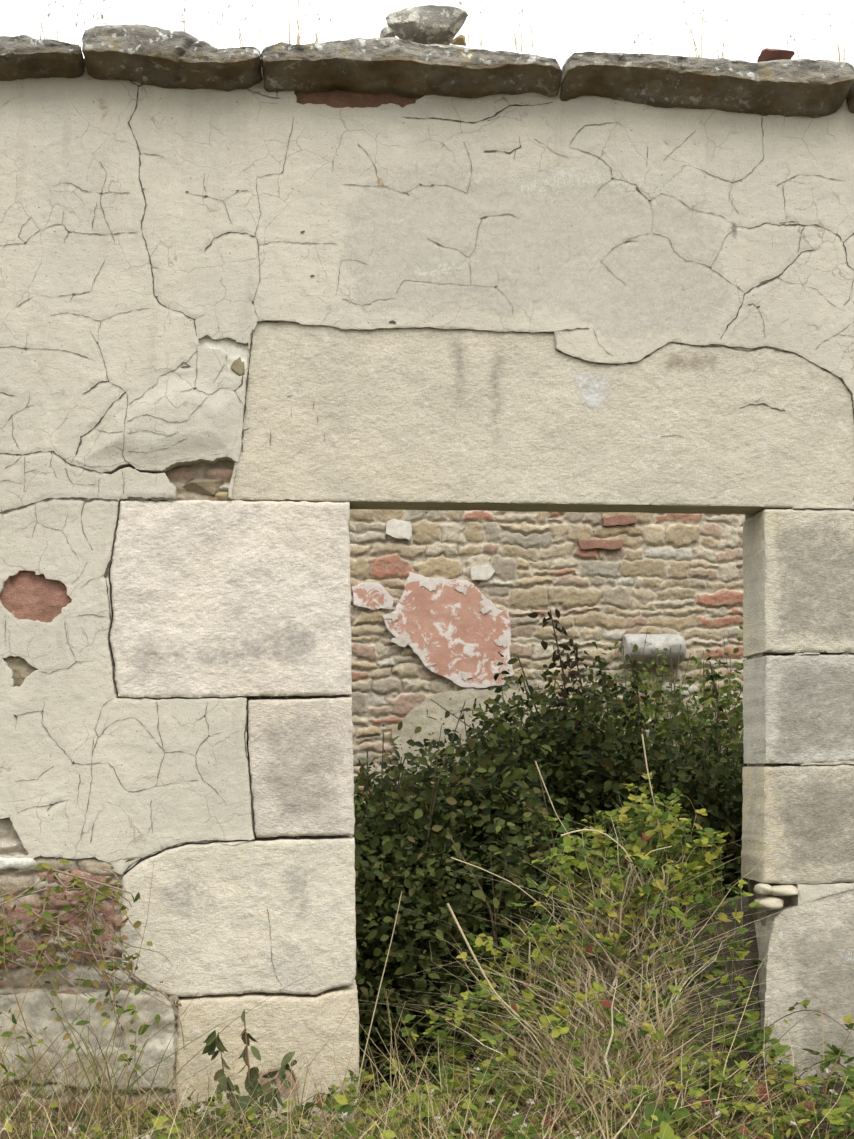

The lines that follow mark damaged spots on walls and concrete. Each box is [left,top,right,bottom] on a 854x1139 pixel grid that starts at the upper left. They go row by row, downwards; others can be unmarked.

flaking render [199,336,248,376]
flaking render [165,460,234,501]
crack [0,80,854,874]
flaking render [0,571,72,623]
peeling [351,572,515,689]
flaking render [4,656,38,687]
flaking render [0,818,180,1139]